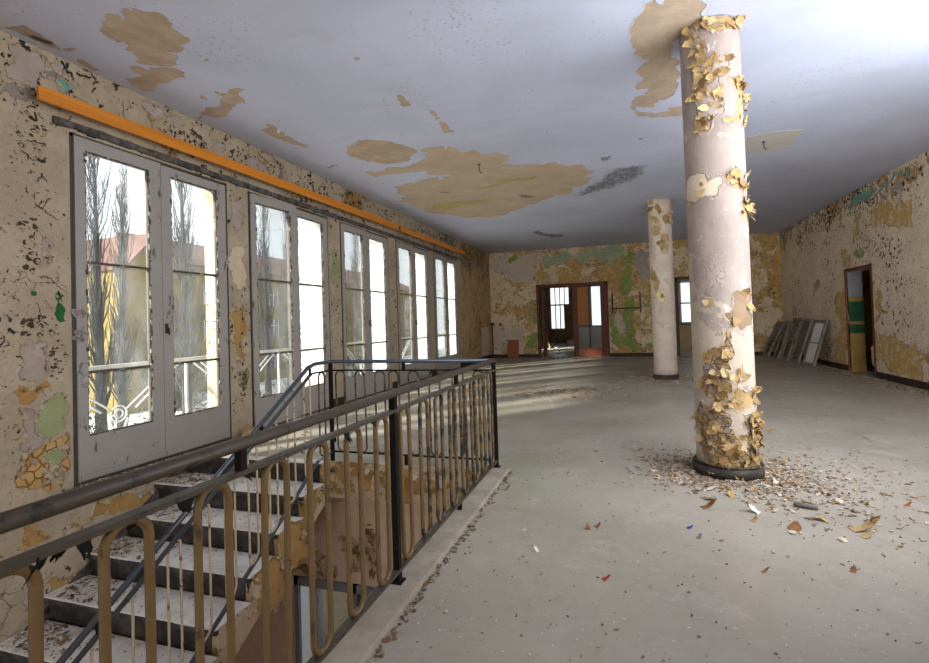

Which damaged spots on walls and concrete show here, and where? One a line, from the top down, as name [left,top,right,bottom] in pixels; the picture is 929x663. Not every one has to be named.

peeling [95,6,192,92]
peeling [198,87,247,120]
peeling [627,0,751,137]
peeling [18,217,56,275]
peeling [344,138,595,246]
mould [583,166,643,194]
peeling [609,199,674,353]
peeling [686,165,756,228]
peeling [797,166,925,382]
peeling [10,289,91,494]
peeling [690,268,765,498]
peeling [250,520,383,617]